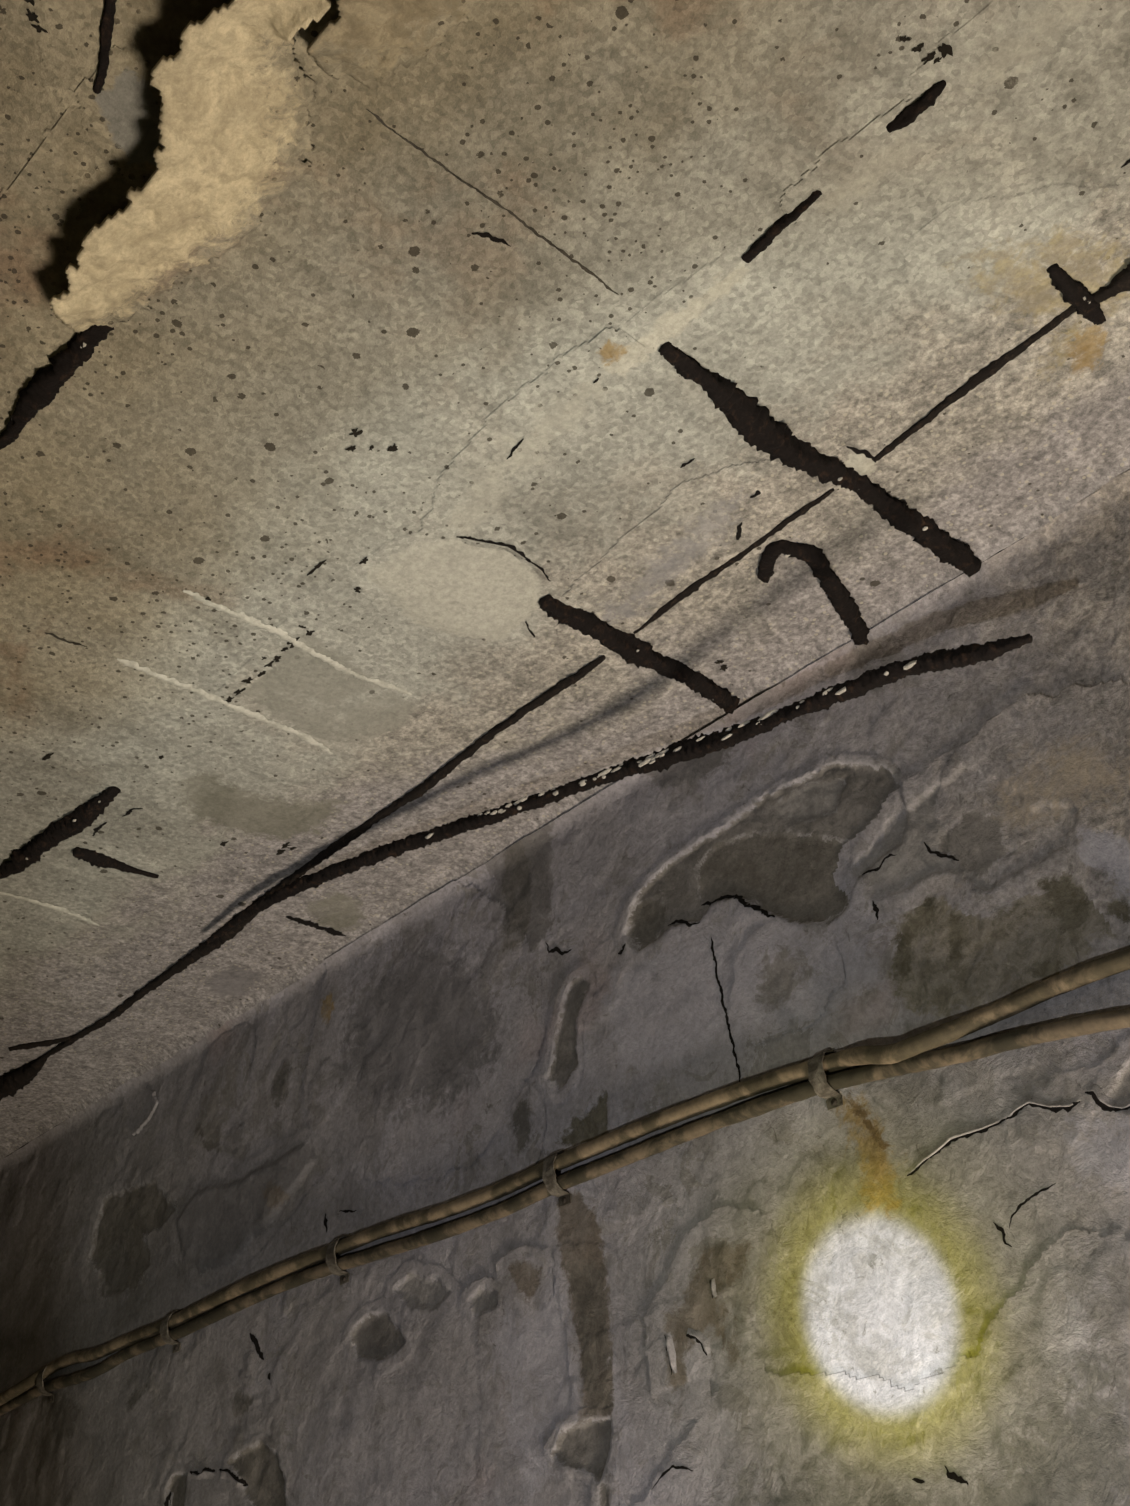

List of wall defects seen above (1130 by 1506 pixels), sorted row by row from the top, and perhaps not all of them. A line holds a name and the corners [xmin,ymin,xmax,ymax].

spalling [293,0,339,80]
spalling [0,0,232,343]
crack [847,446,876,463]
crack [736,490,761,540]
crack [92,808,143,836]
crack [858,842,959,920]
crack [286,916,346,936]
crack [546,943,571,956]
crack [668,894,775,1082]
rust [811,1066,928,1251]
crack [905,1082,1130,1176]
crack [652,1465,693,1489]